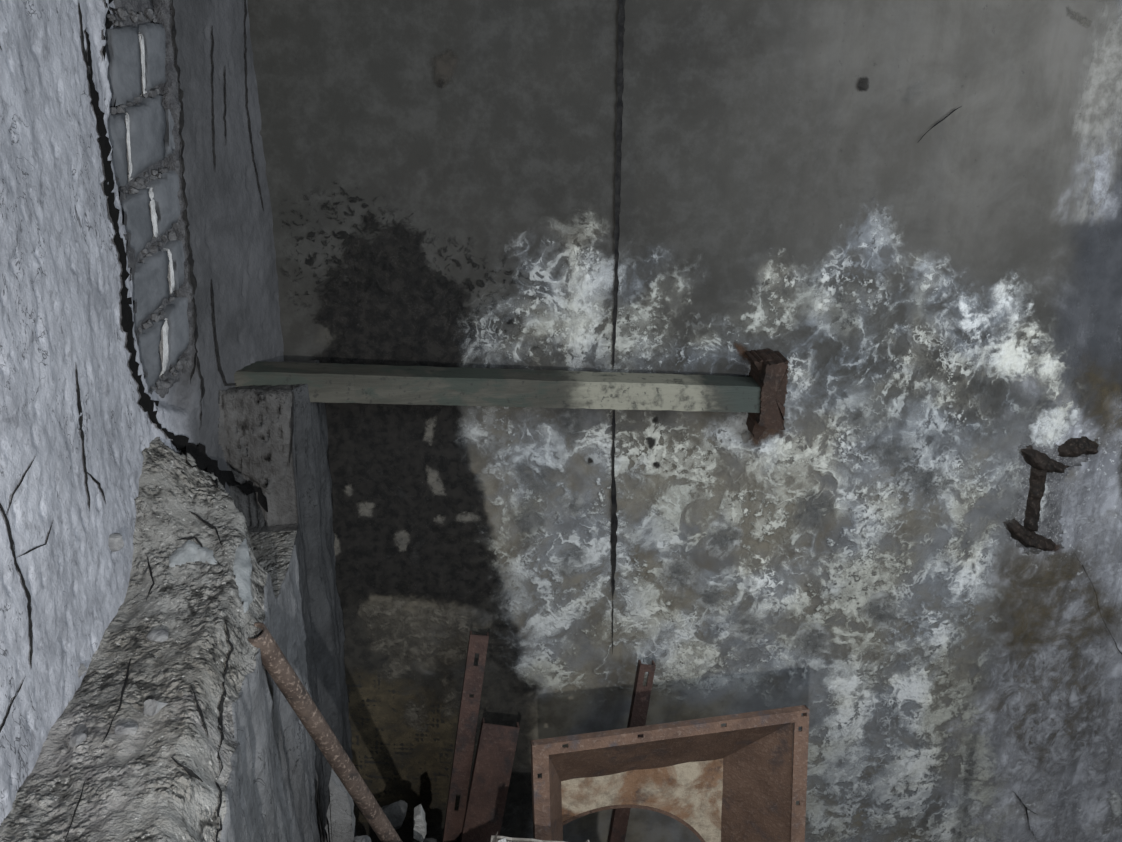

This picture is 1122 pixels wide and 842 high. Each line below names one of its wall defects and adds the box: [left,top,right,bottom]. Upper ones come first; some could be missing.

crack [612,0,625,368]
crack [76,0,294,512]
water stain [282,0,1122,842]
corrosion [751,428,782,444]
crack [0,456,54,733]
crack [146,555,155,600]
spalling [169,540,217,567]
crack [175,511,225,567]
spalling [233,538,253,613]
crack [610,409,618,652]
crack [101,658,131,745]
crack [64,778,87,842]